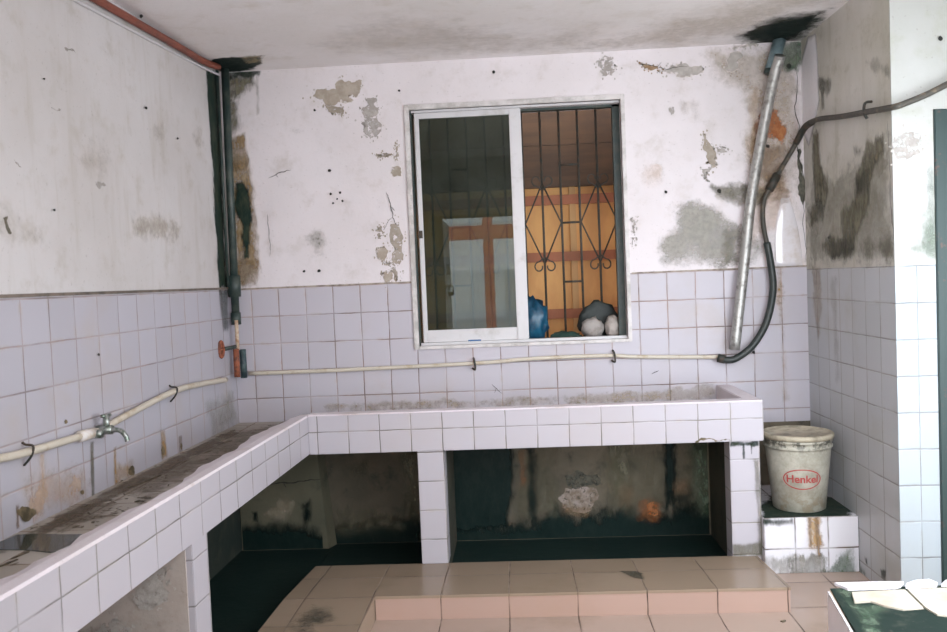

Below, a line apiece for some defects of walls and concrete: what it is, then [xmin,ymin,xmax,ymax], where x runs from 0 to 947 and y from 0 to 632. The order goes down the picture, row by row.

peeling [594,52,622,80]
spalling [637,15,817,80]
peeling [302,75,402,177]
peeling [372,215,407,288]
water stain [662,202,741,264]
corrosion [754,109,786,188]
water stain [810,133,828,223]
water stain [825,134,884,258]
water stain [335,451,421,544]
peeling [558,470,602,514]
water stain [453,442,710,541]
corrosion [809,517,822,556]